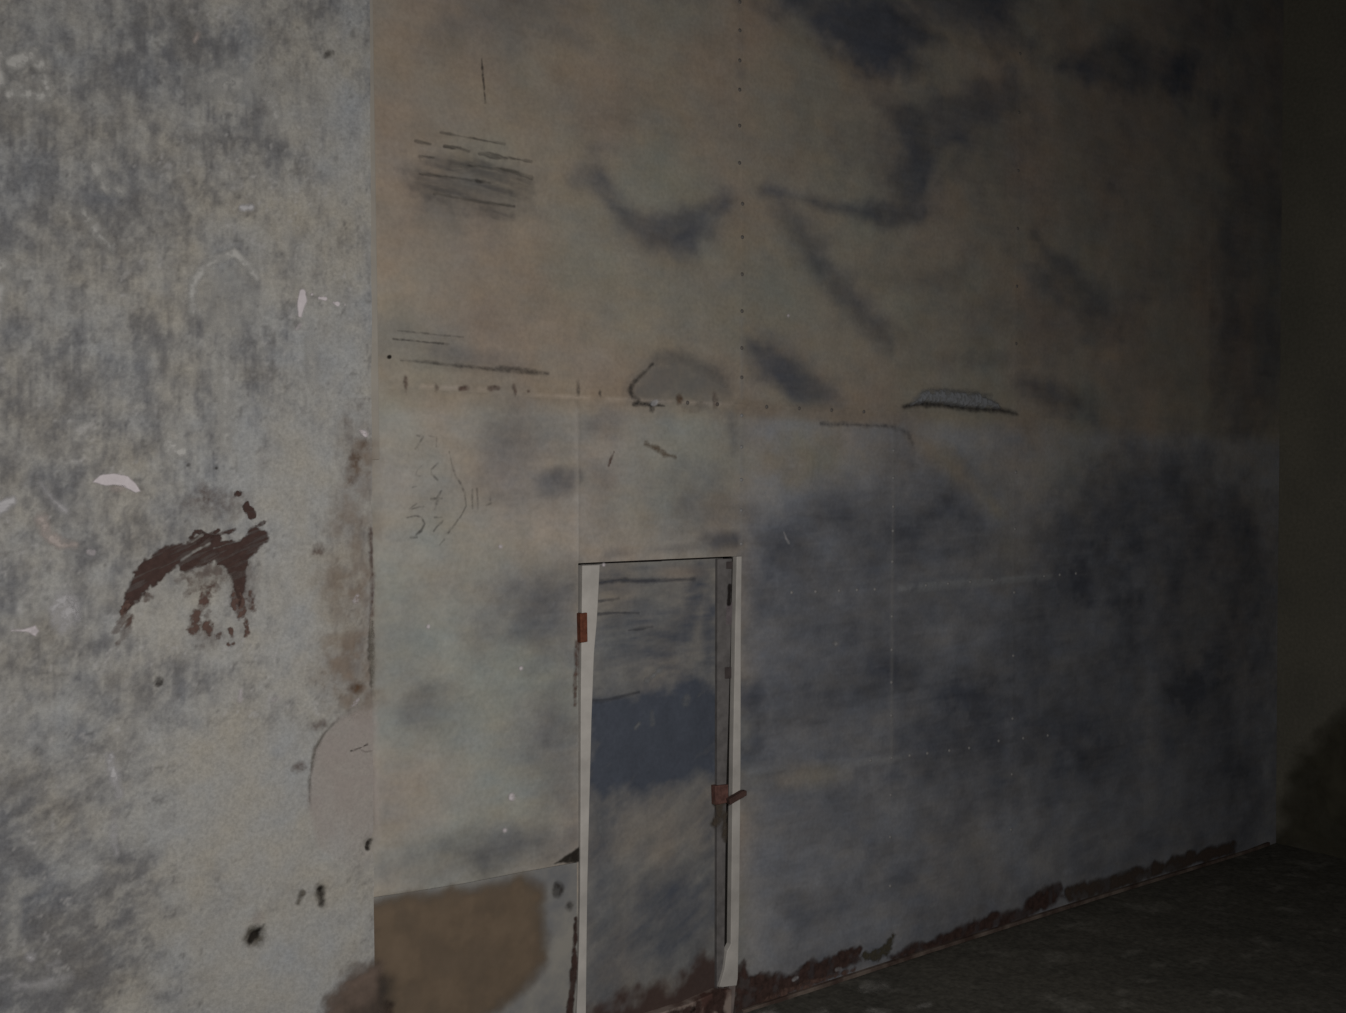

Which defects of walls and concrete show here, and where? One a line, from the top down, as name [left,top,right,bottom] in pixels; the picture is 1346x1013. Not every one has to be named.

corrosion [120,491,269,646]
damp [326,963,387,1013]
corrosion [374,877,545,1013]
corrosion [566,917,578,1013]